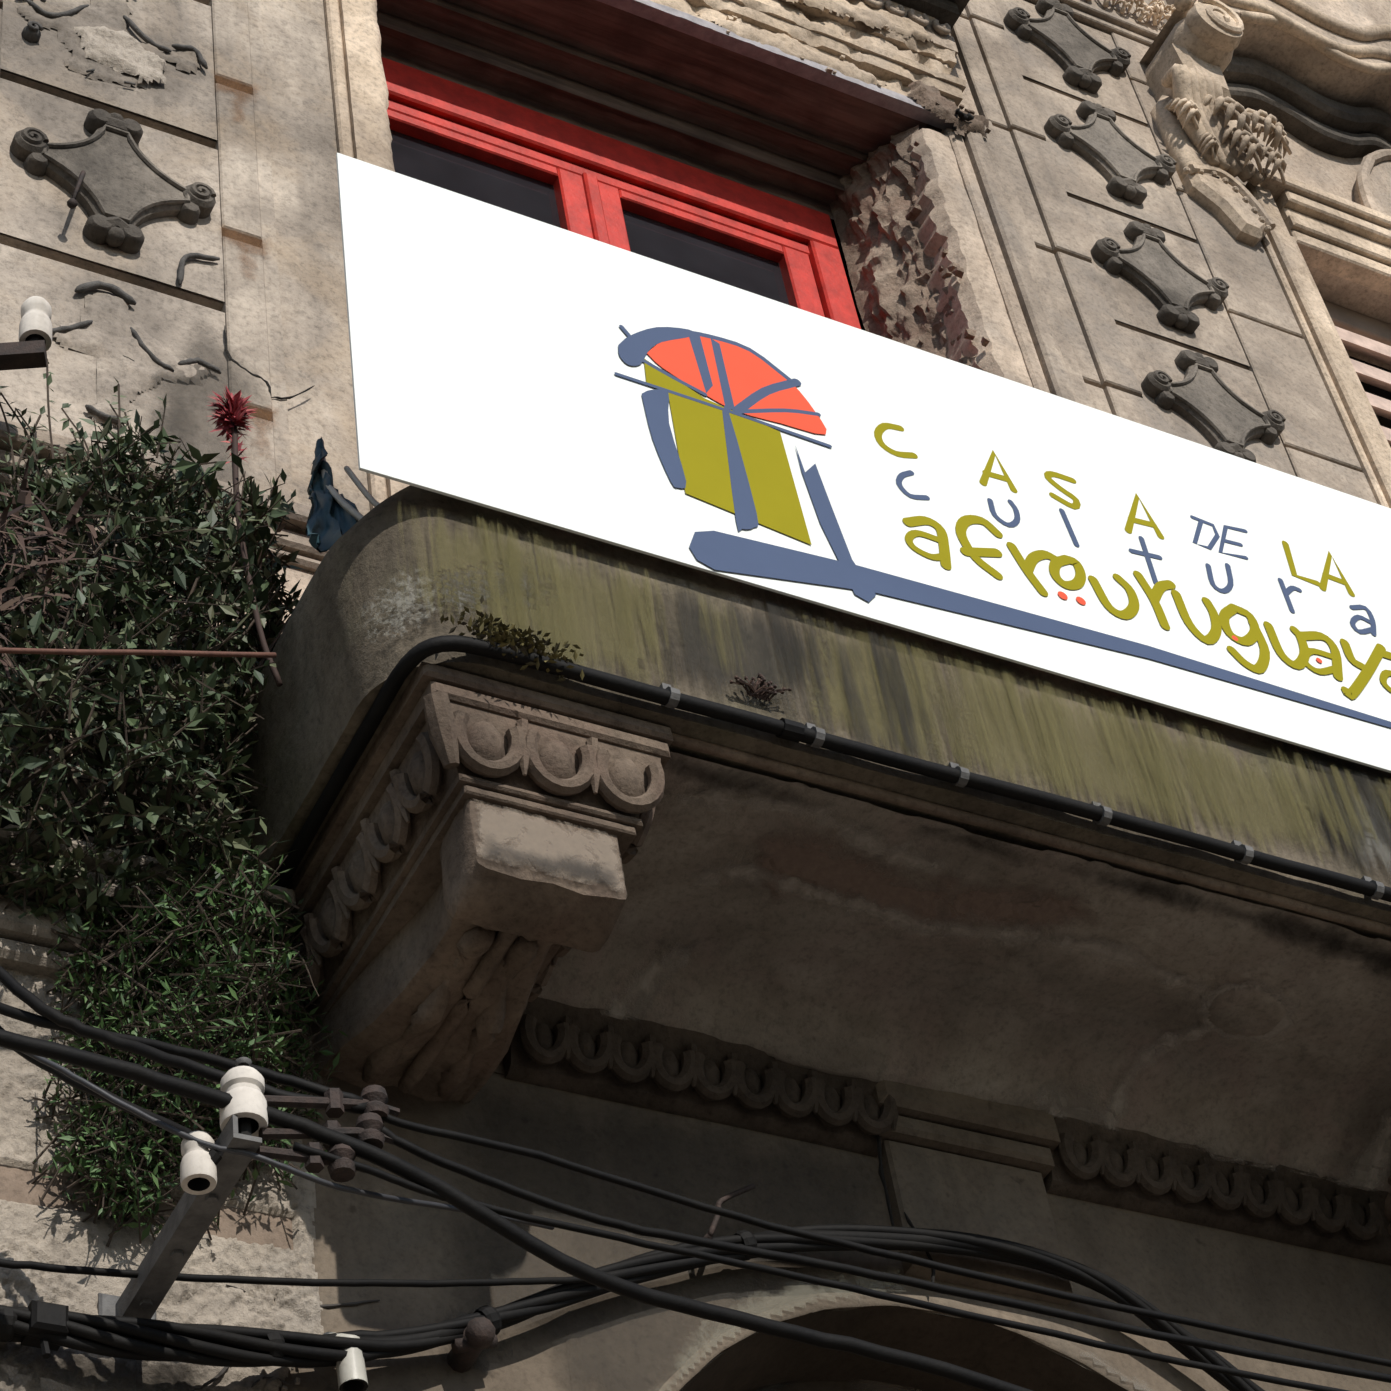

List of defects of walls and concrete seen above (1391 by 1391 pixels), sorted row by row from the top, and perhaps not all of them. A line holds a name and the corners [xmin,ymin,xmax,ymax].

spalling [17,0,208,90]
crack [224,326,315,400]
water stain [670,591,794,708]
water stain [1289,744,1391,860]
water stain [478,808,622,889]